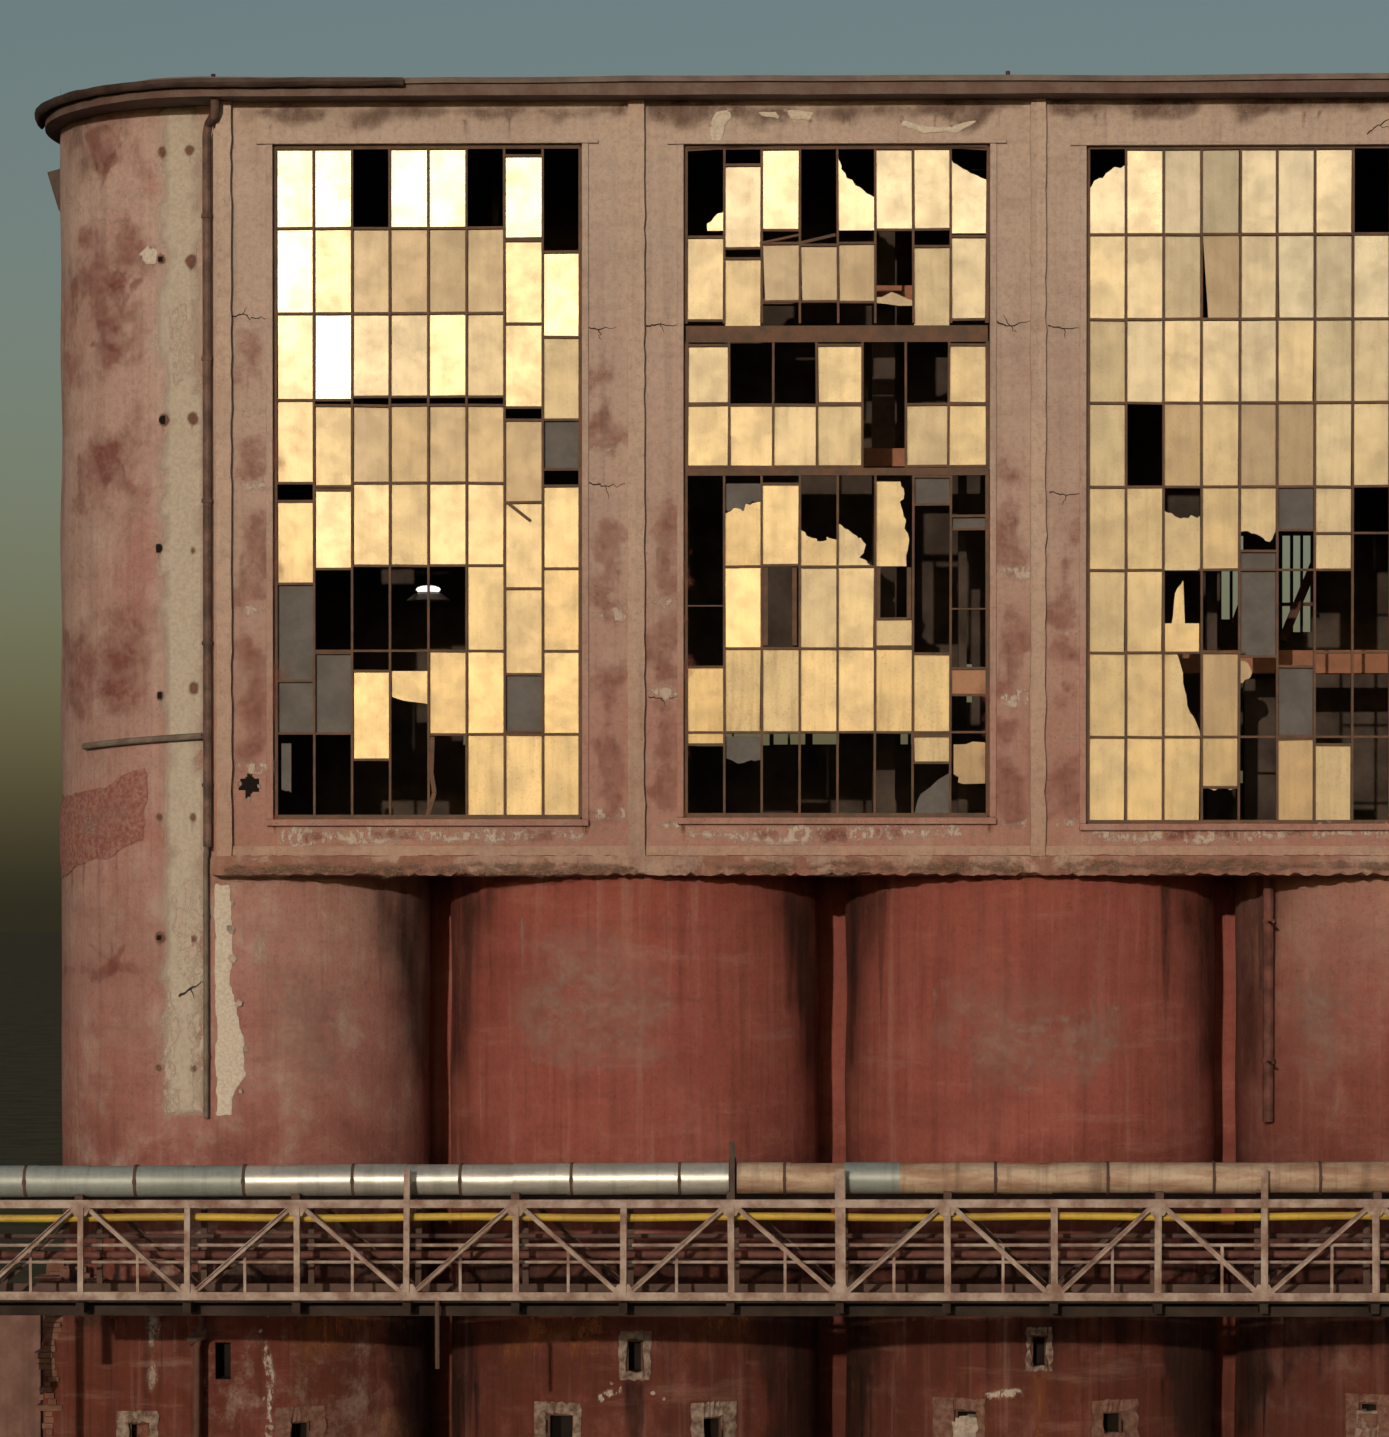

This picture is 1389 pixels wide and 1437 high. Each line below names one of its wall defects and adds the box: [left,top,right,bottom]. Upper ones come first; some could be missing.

crack [589,323,677,340]
crack [997,314,1078,339]
peeling [140,107,248,1116]